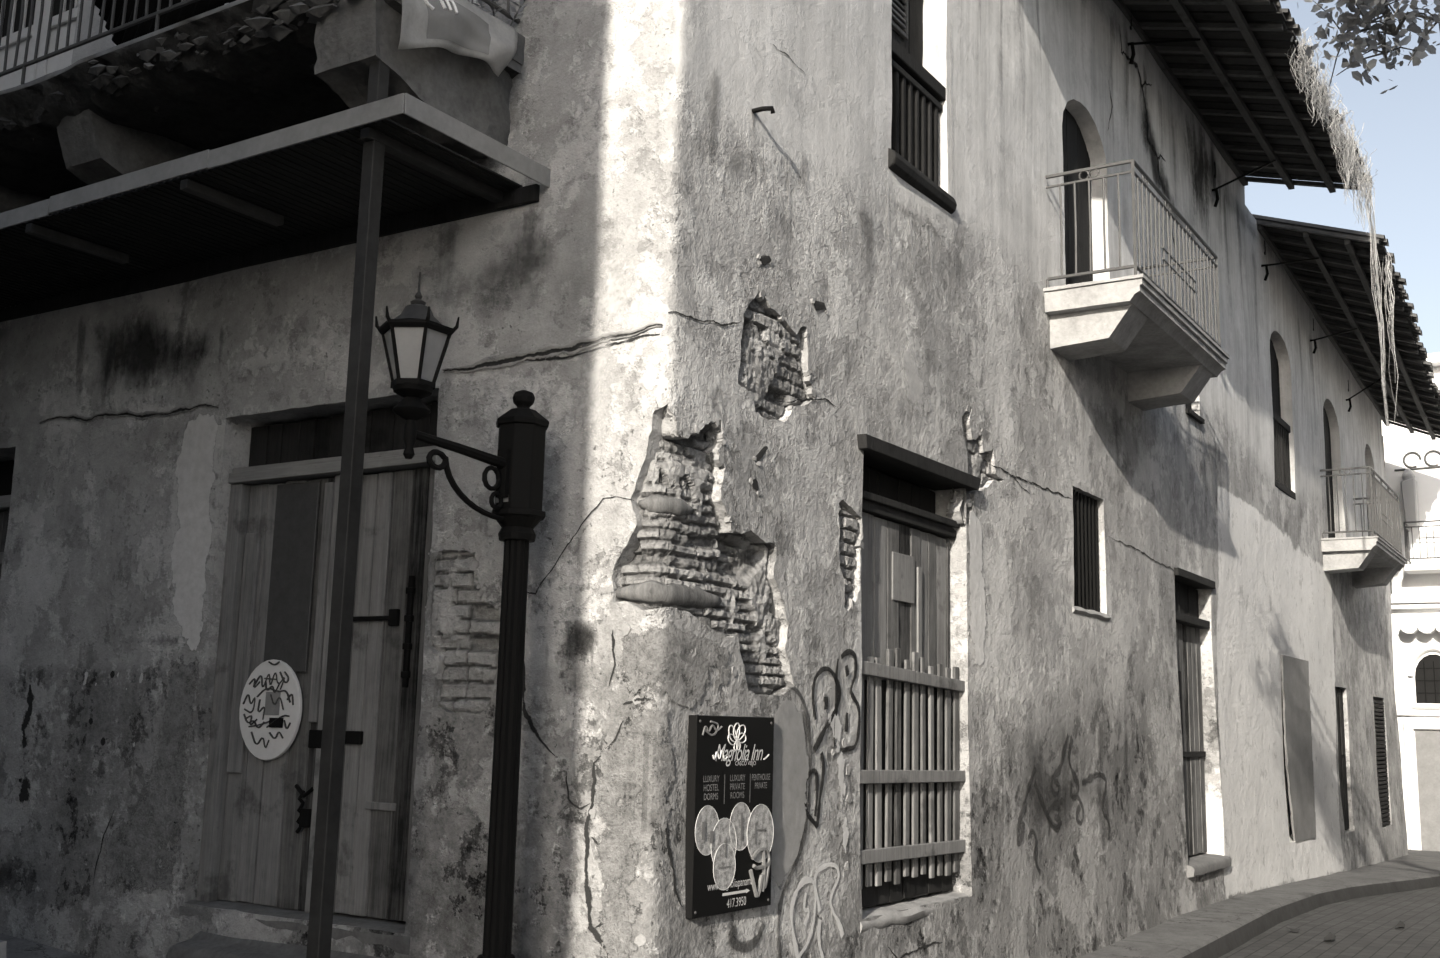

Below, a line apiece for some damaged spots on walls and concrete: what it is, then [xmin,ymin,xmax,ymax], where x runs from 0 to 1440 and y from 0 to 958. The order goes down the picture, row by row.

damp [1143,108,1173,212]
damp [103,319,205,386]
crack [442,311,740,373]
spalling [738,284,816,420]
spalling [810,299,828,315]
crack [39,403,217,424]
crack [989,464,1071,499]
crack [527,496,634,594]
spalling [838,505,864,608]
spalling [425,550,501,714]
spalling [587,410,784,958]
crack [522,630,646,956]